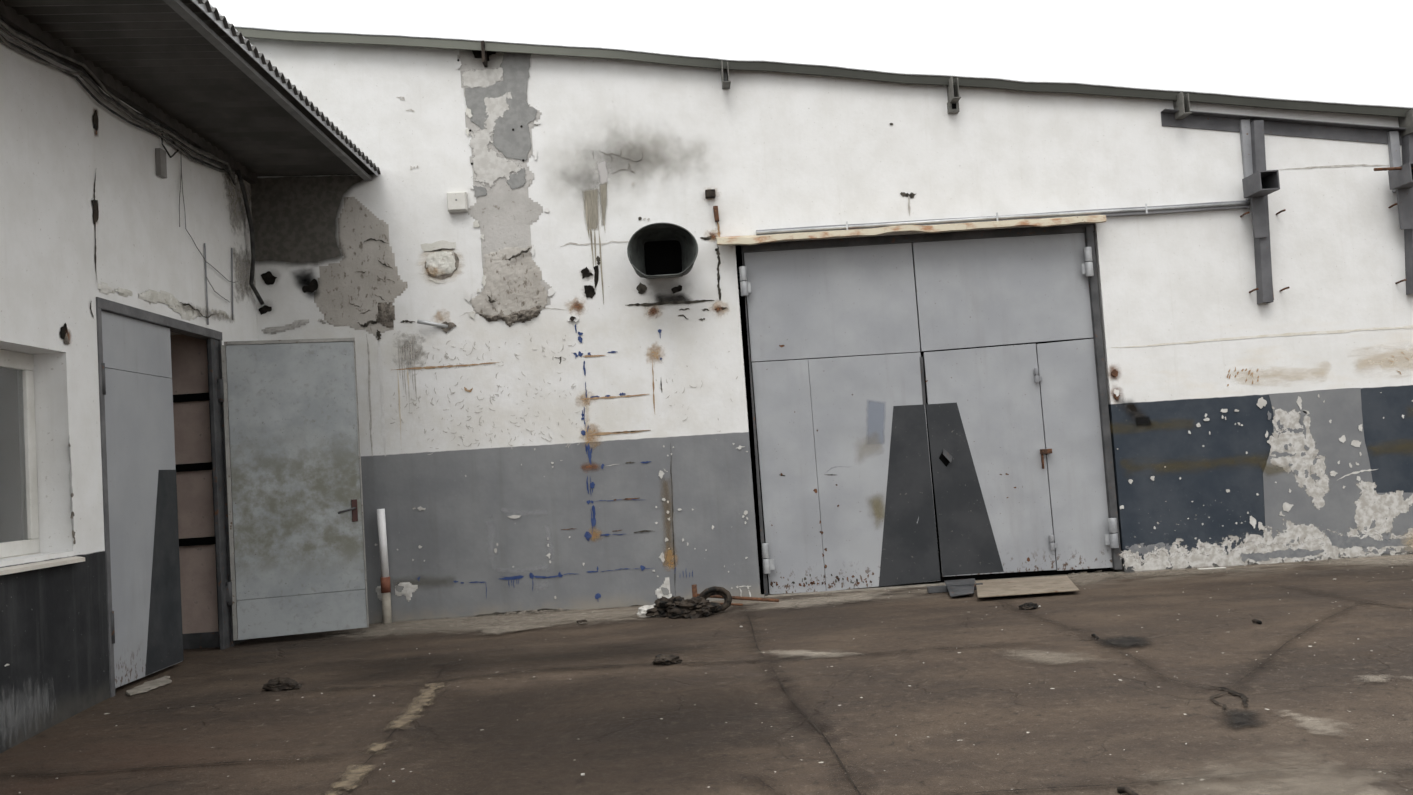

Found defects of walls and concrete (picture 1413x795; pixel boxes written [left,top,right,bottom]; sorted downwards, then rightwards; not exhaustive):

flaking render [258,197,408,340]
flaking render [441,41,555,333]
leakage [584,183,607,304]
rust [585,429,650,446]
rust [581,347,662,412]
rust [664,468,676,567]
peeling [1119,388,1413,571]